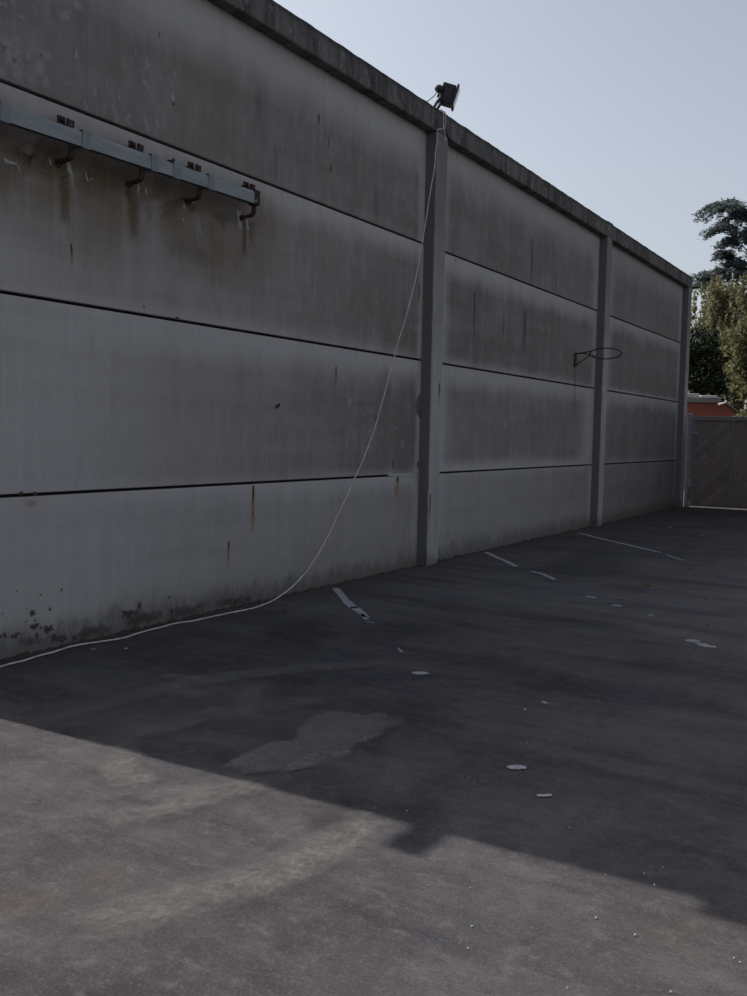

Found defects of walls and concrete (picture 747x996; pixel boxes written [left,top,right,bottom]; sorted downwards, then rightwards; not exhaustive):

leakage [0,610,109,644]